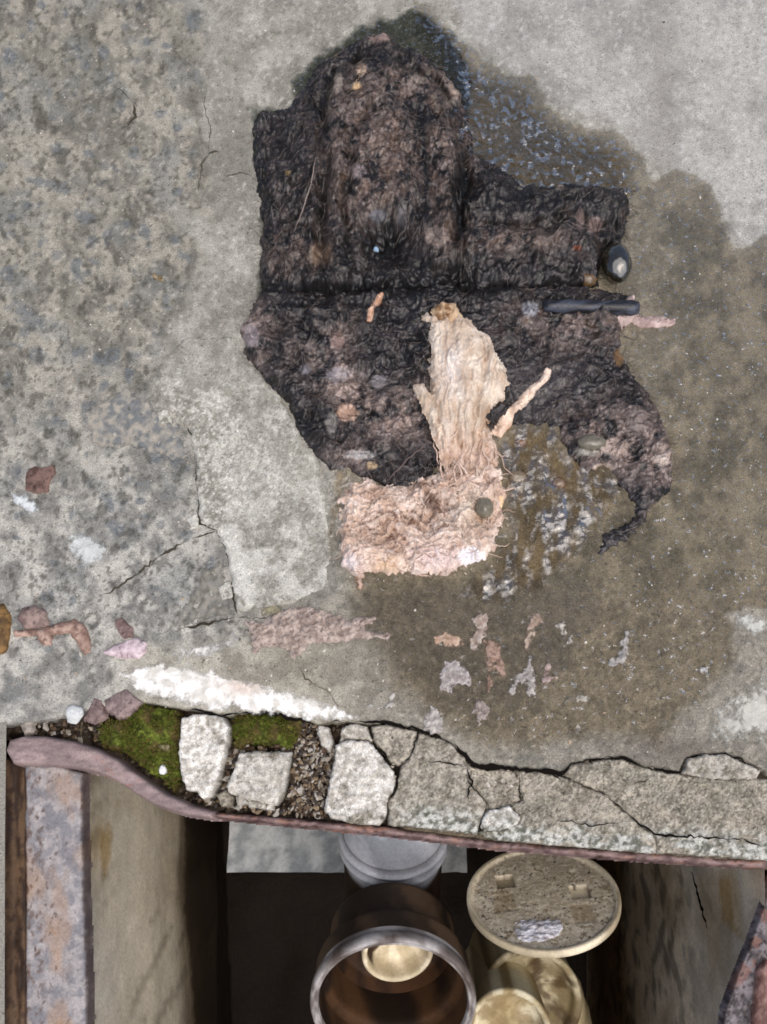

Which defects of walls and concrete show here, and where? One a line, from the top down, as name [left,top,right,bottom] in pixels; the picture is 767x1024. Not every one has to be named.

water stain [291,3,767,652]
crack [102,429,271,633]
water stain [119,634,356,721]
crack [192,670,767,848]
water stain [712,678,767,744]